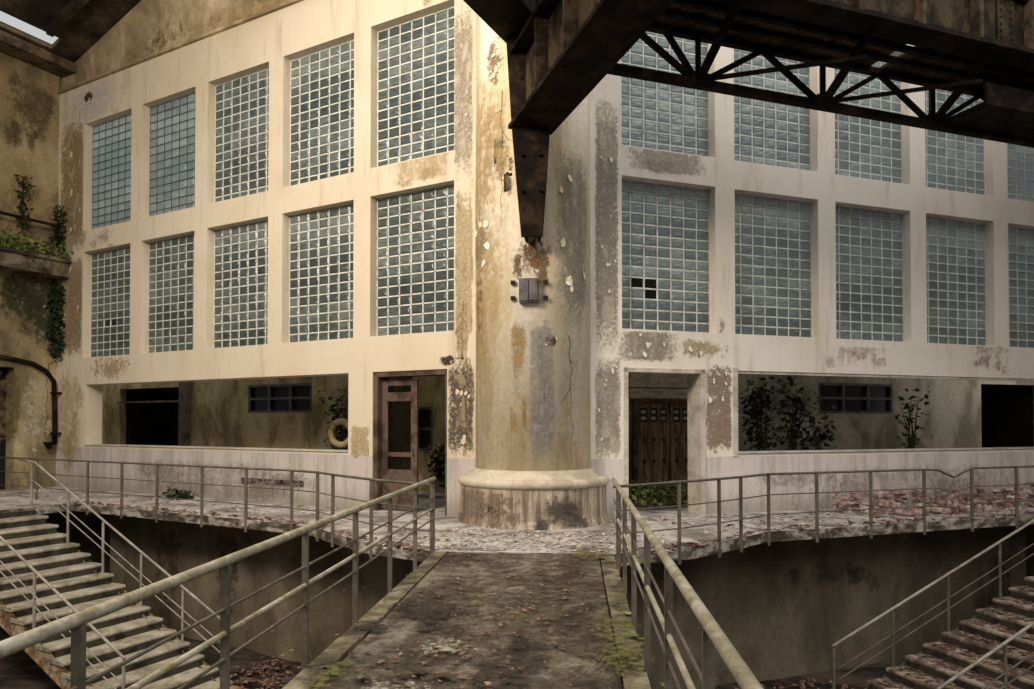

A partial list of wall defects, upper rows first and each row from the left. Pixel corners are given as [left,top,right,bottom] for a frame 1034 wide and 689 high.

leakage [6,76,54,150]
flaking render [441,11,489,456]
leakage [475,95,513,358]
flaking render [555,102,732,458]
leakage [510,320,554,466]
leakage [458,488,520,530]
leakage [533,495,588,530]